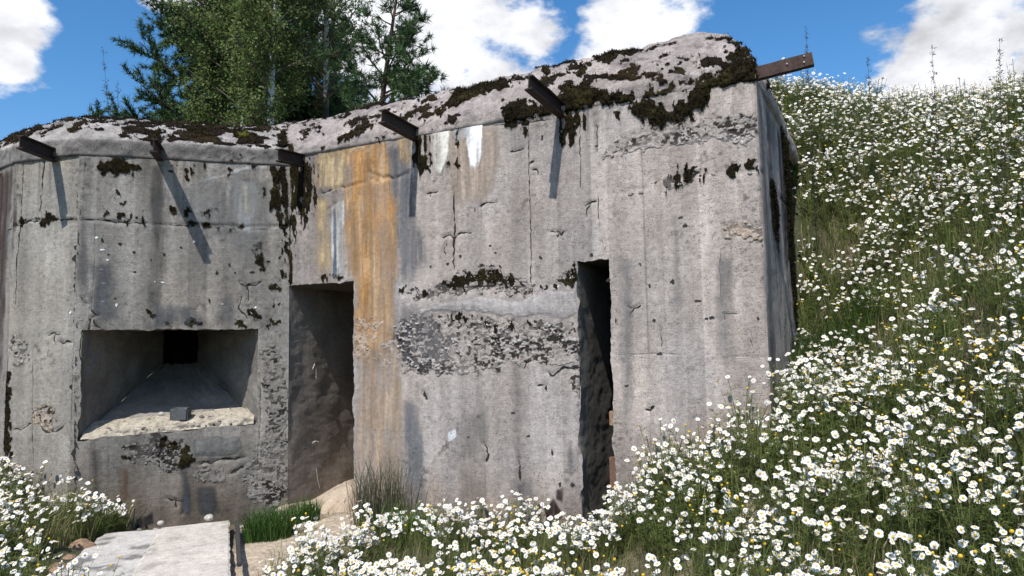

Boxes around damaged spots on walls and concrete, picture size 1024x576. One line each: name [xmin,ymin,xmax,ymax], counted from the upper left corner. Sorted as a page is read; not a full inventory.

crack [427,188,471,269]
rust [317,139,409,480]
spalling [354,245,580,399]
spalling [31,403,57,432]
spalling [121,432,192,473]
spalling [242,345,288,508]